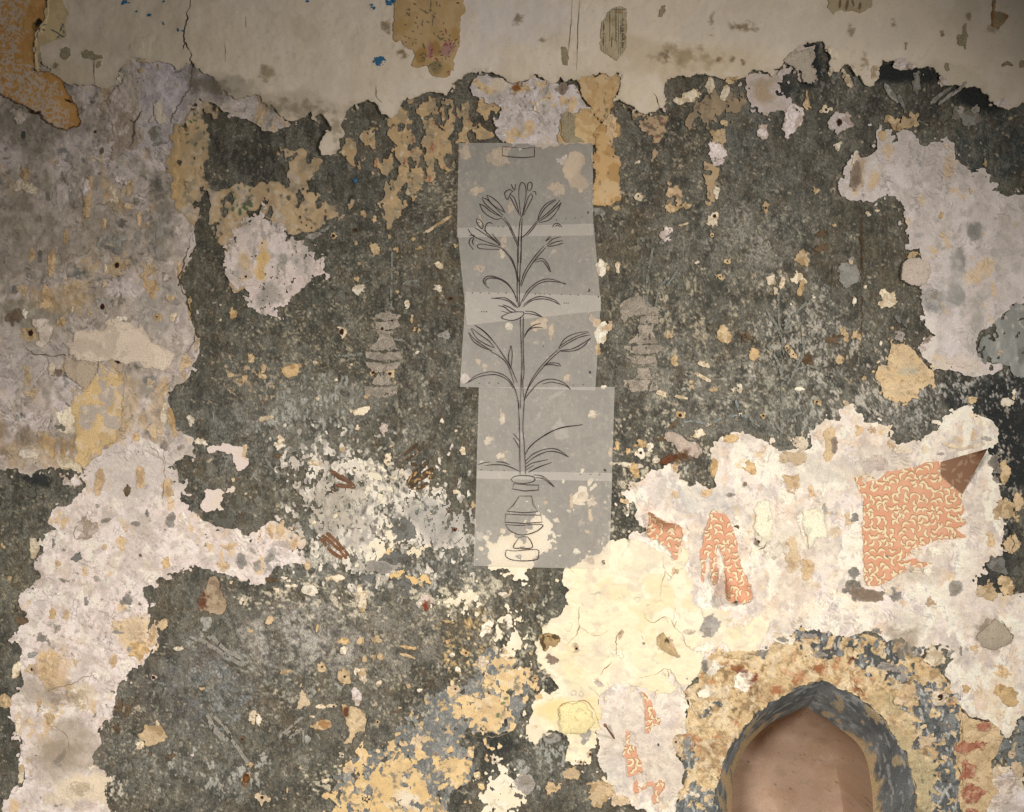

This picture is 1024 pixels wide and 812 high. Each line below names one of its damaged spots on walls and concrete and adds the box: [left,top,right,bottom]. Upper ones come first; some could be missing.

crack [171,0,195,121]
peeling [892,61,924,76]
peeling [603,45,858,164]
peeling [703,142,727,206]
spalling [595,259,621,277]
spalling [659,222,688,242]
peeling [766,249,810,295]
peeling [833,116,1024,407]
peeling [594,321,608,344]
spalling [694,360,711,382]
peeling [0,53,592,812]
peeling [526,403,1024,812]